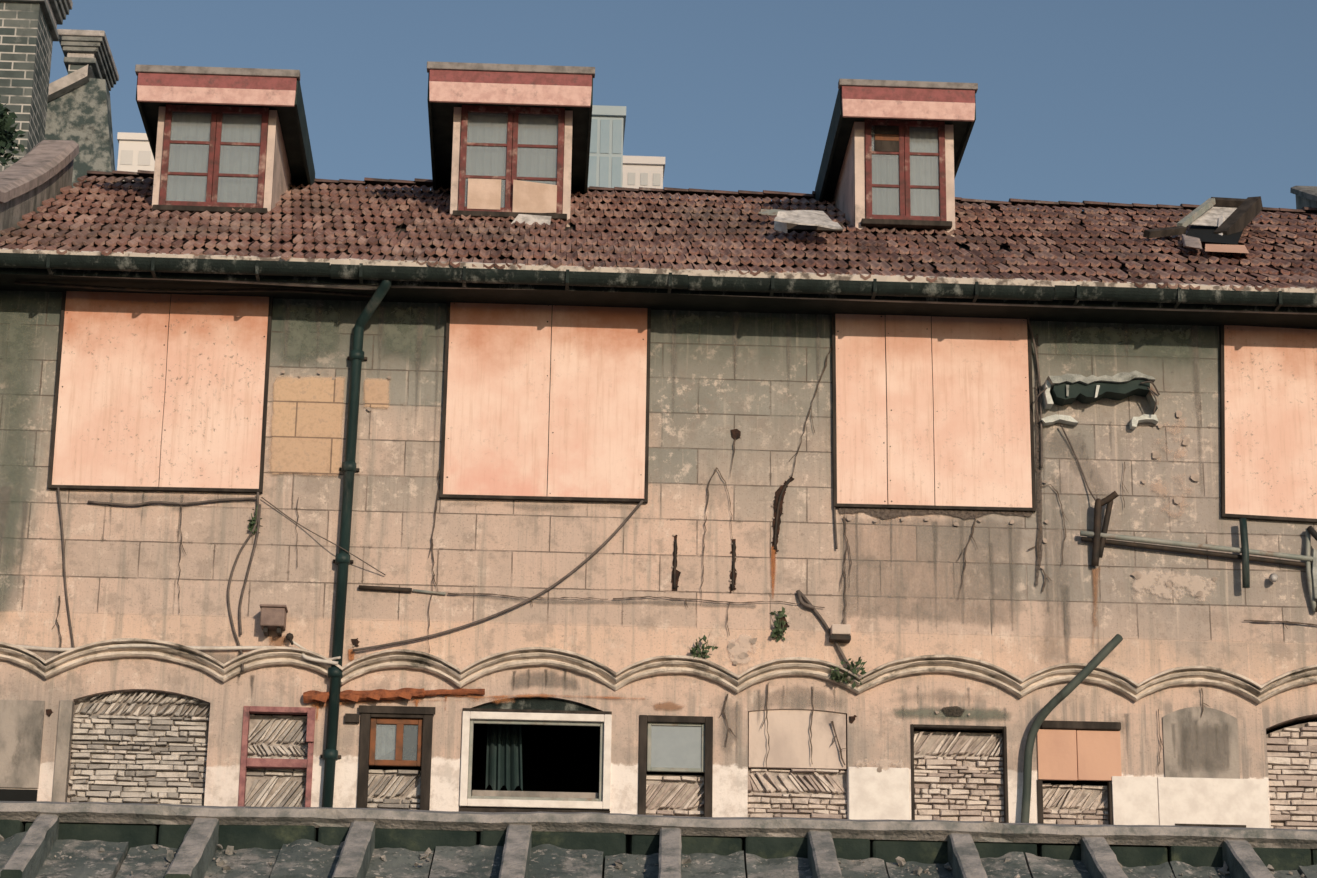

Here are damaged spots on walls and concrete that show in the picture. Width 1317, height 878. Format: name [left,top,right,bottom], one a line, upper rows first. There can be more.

flaking render [1131,571,1217,601]